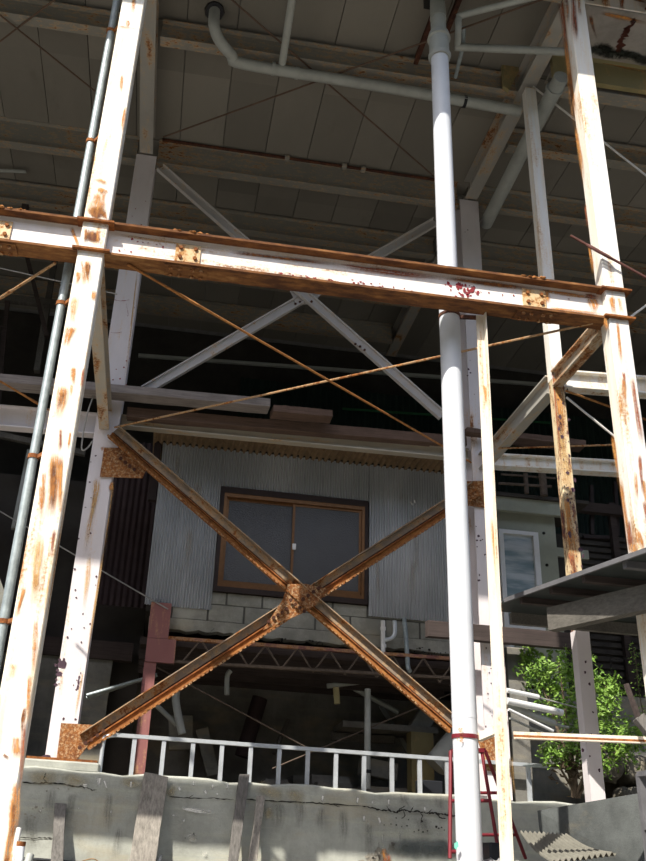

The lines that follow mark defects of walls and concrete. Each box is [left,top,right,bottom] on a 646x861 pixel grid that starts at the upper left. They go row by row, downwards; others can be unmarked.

damp [591,43,646,64]
rust [240,252,324,264]
rust [347,265,429,278]
rust [57,368,84,410]
rust [39,430,71,509]
rust [635,456,646,517]
rust [17,533,55,612]
rust [3,678,31,771]
crack [23,773,93,791]
rust [4,786,19,861]
crack [169,795,455,820]
damp [399,836,448,856]